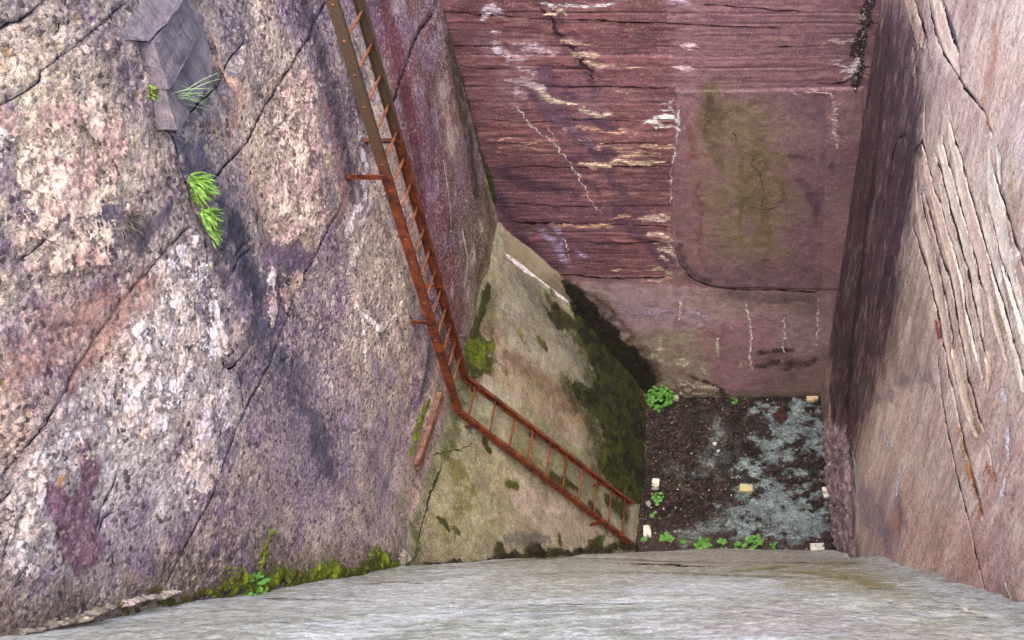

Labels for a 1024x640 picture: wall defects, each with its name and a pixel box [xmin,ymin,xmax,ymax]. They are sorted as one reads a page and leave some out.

crack [415,443,472,558]
water stain [506,254,630,524]